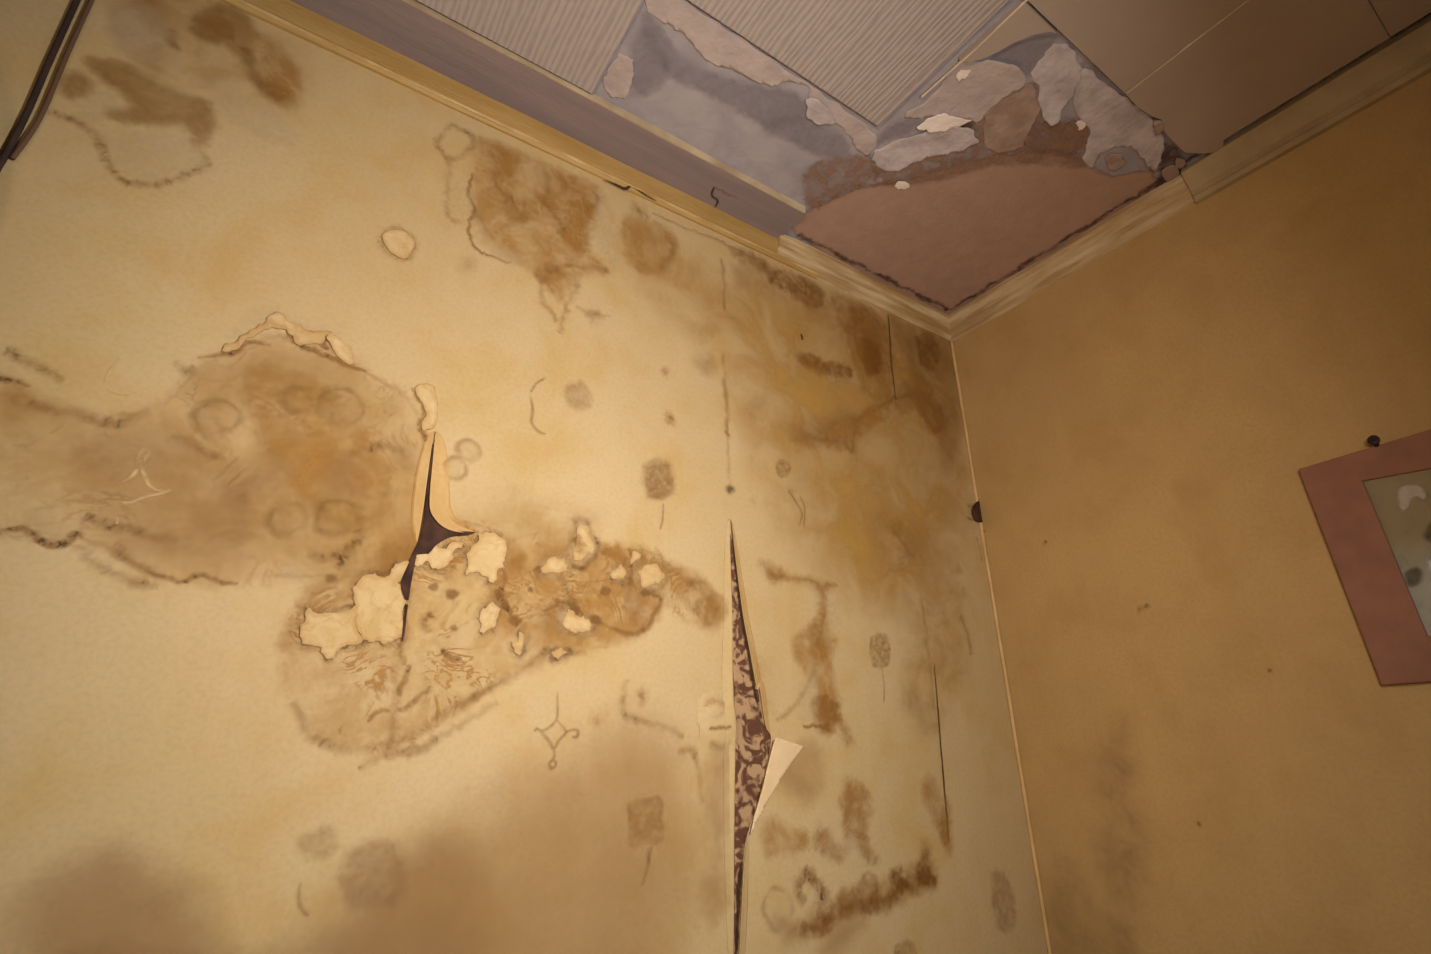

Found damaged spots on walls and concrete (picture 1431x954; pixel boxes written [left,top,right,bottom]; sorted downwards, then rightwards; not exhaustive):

peeling [603,53,634,99]
flaking render [645,0,1164,315]
leakage [723,309,953,584]
leakage [18,526,75,548]
peeling [300,532,507,660]
leakage [404,525,502,582]
peeling [540,524,594,574]
peeling [562,609,592,634]
leakage [495,547,680,658]
peeling [610,551,665,587]
leakage [344,628,489,719]